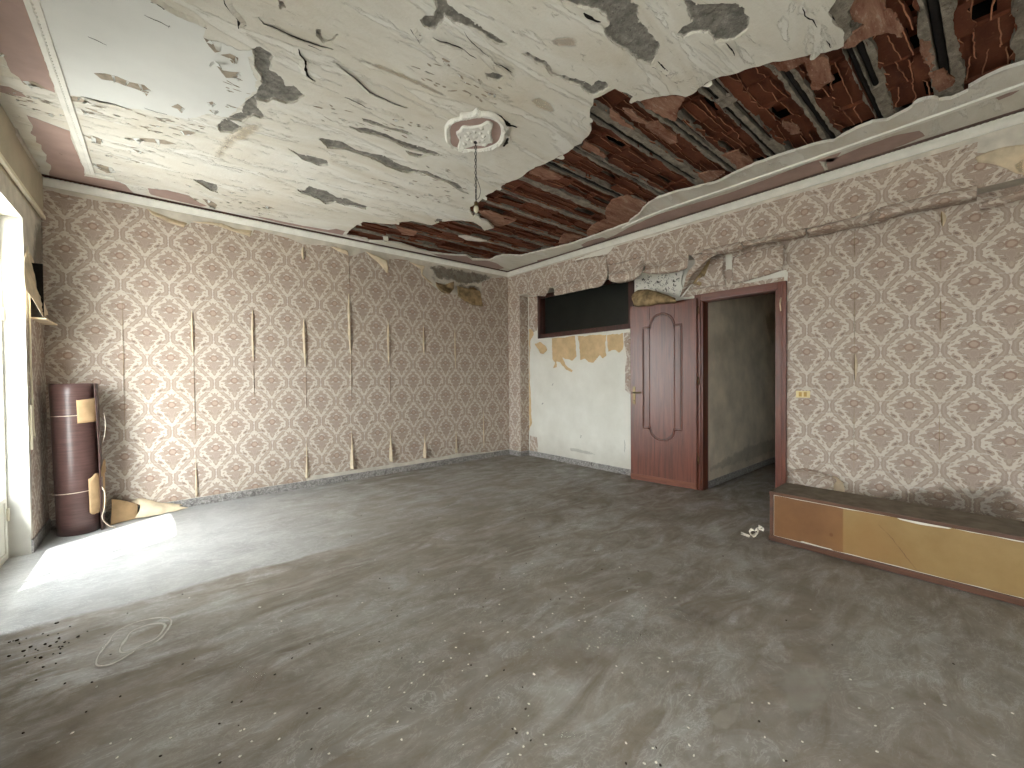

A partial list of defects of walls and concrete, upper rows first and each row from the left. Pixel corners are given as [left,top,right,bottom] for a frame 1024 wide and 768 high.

crack [145,0,209,29]
spalling [421,0,505,46]
spalling [562,0,660,66]
spalling [678,0,749,40]
peeling [5,81,64,117]
crack [81,96,167,115]
crack [224,0,407,120]
peeling [411,58,505,104]
spalling [524,52,608,94]
spalling [314,104,467,203]